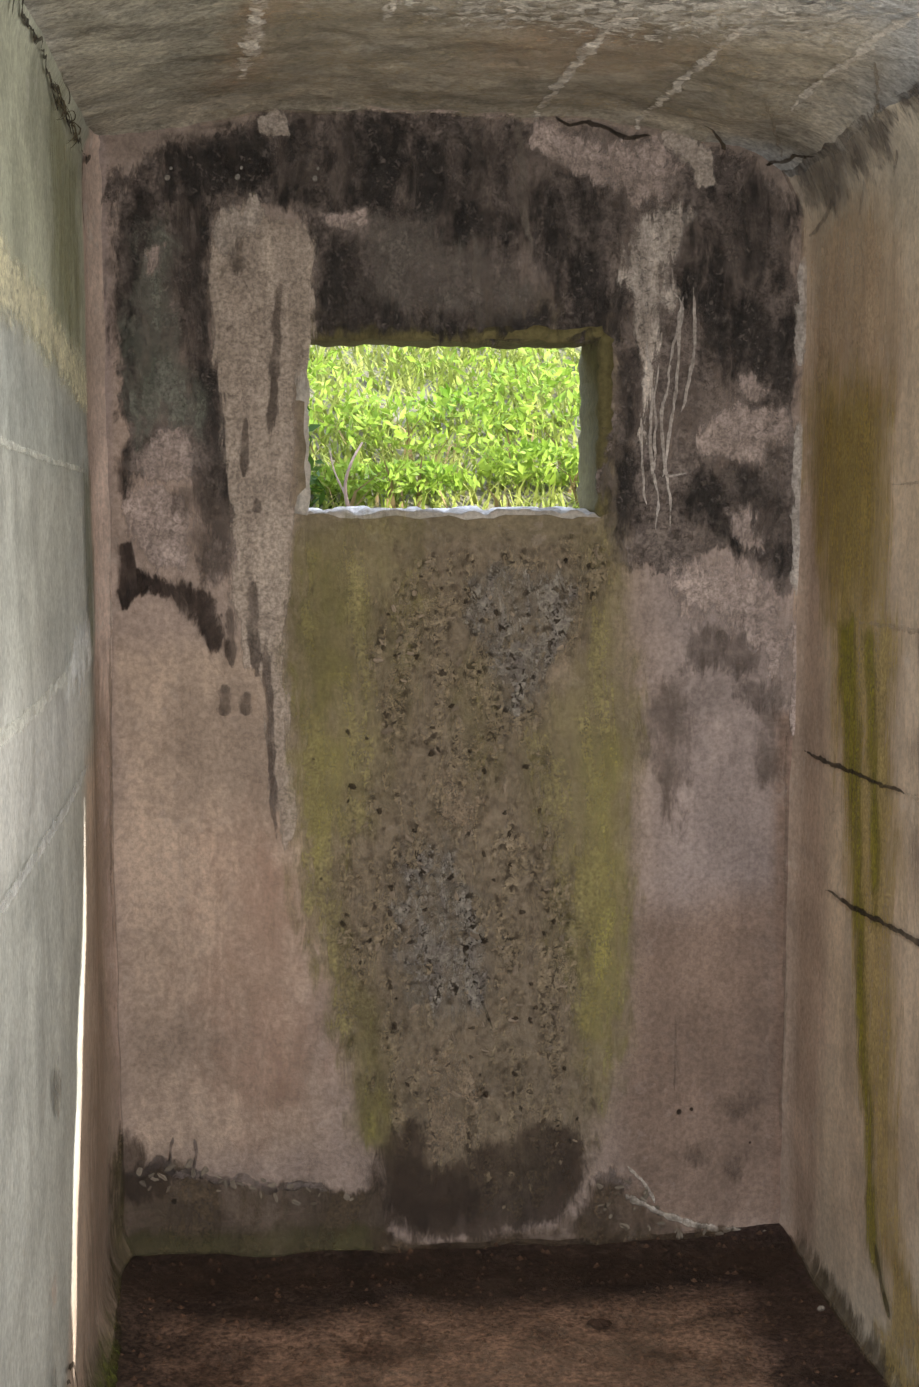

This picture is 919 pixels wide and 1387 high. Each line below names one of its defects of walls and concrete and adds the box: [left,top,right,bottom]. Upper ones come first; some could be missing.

crack [12,0,91,221]
leakage [101,87,919,827]
crack [804,750,904,794]
leakage [792,613,919,1387]
crack [826,890,919,946]
leakage [109,1119,740,1307]